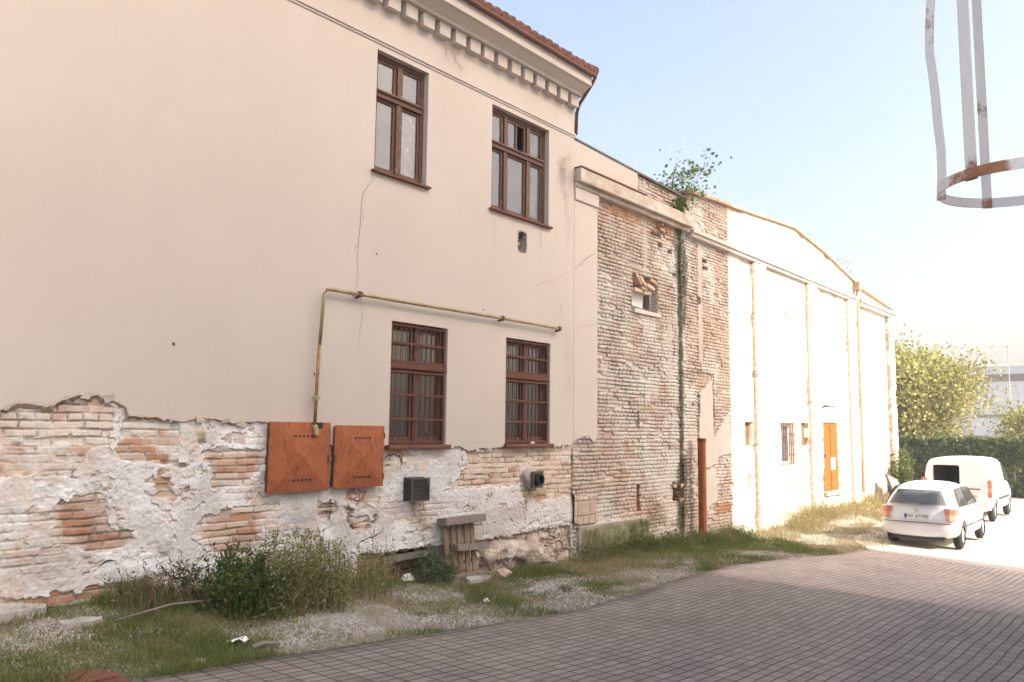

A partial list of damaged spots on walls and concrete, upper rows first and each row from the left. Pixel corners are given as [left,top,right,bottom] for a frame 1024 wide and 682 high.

crack [355,173,373,351]
flaking render [48,492,138,554]
flaking render [0,392,267,507]
flaking render [191,501,281,558]
flaking render [317,445,383,535]
flaking render [383,449,407,473]
flaking render [443,435,597,501]
flaking render [0,571,175,606]